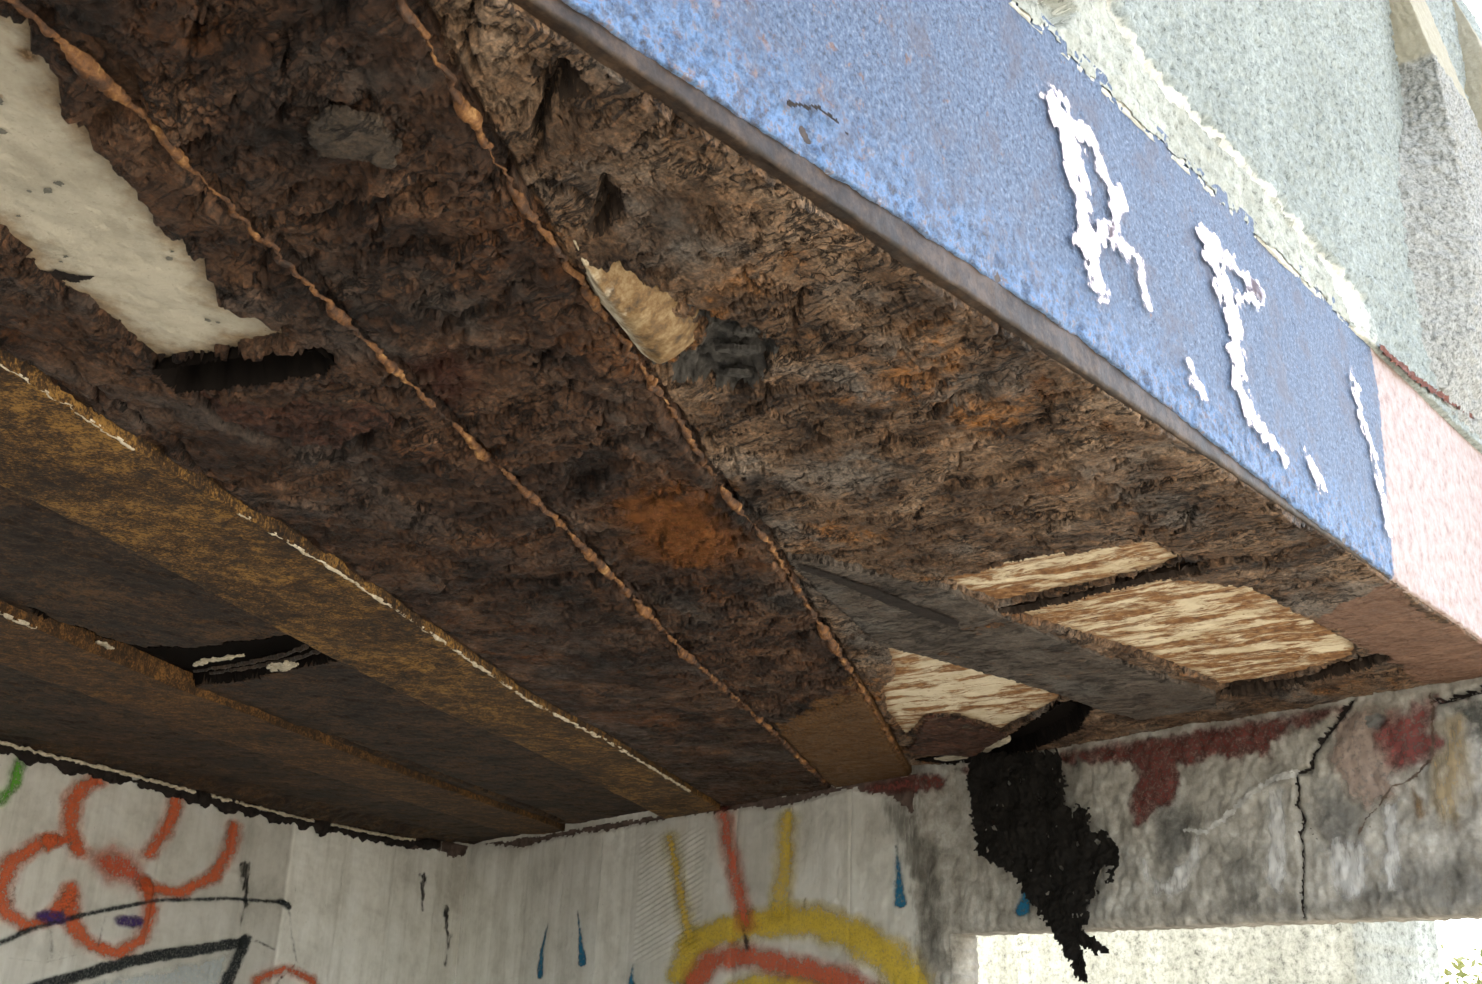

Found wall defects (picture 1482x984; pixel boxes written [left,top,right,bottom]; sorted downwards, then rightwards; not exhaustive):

crack [464,22,513,62]
crack [531,59,571,137]
spalling [0,16,336,394]
crack [317,179,437,218]
peeling [0,364,135,451]
corrosion [3,0,826,784]
corrosion [395,0,1120,983]
peeling [0,607,53,629]
peeling [72,625,338,685]
peeling [268,532,691,792]
spalling [948,542,1389,697]
crack [1358,693,1437,834]